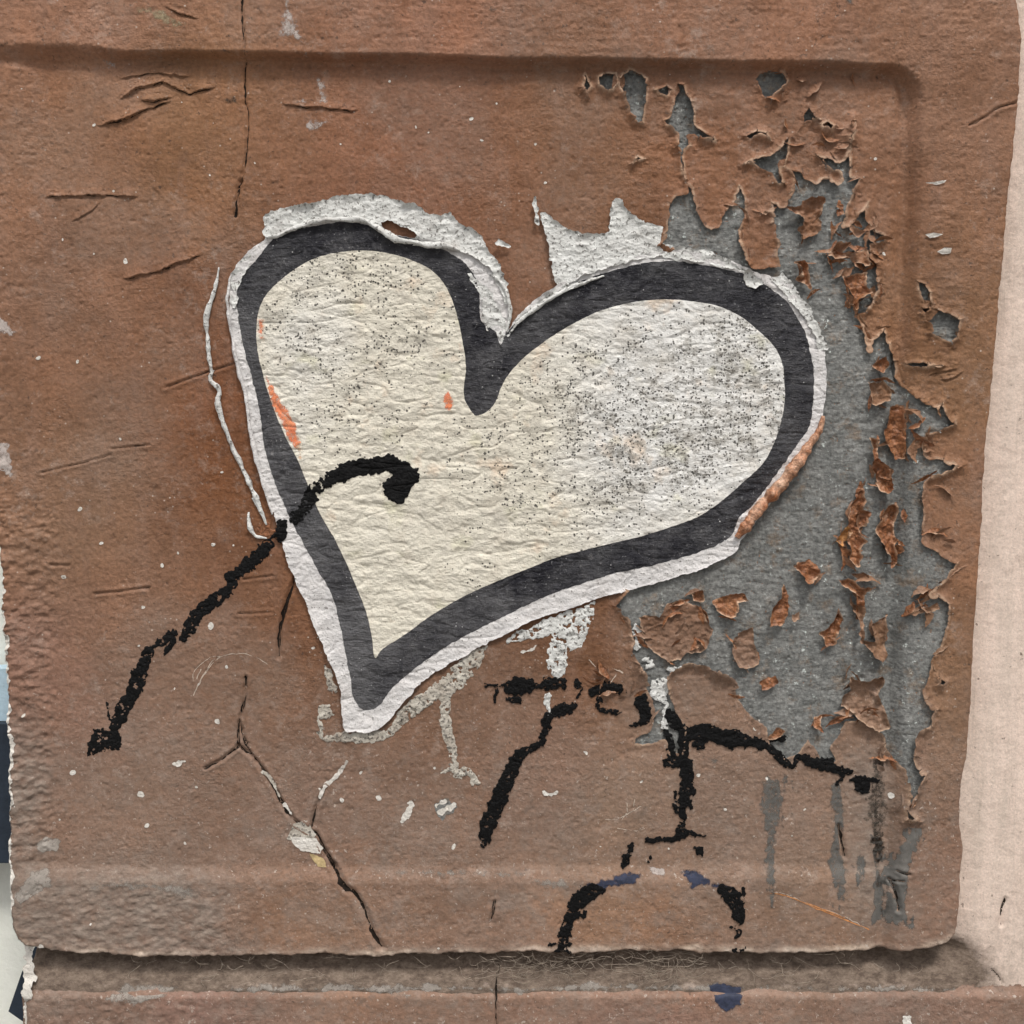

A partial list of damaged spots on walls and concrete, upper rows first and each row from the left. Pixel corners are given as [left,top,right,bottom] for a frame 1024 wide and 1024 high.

crack [234,0,249,218]
peeling [573,58,969,830]
crack [277,577,295,656]
crack [204,676,382,947]
leakage [759,775,793,908]
leakage [827,751,925,930]